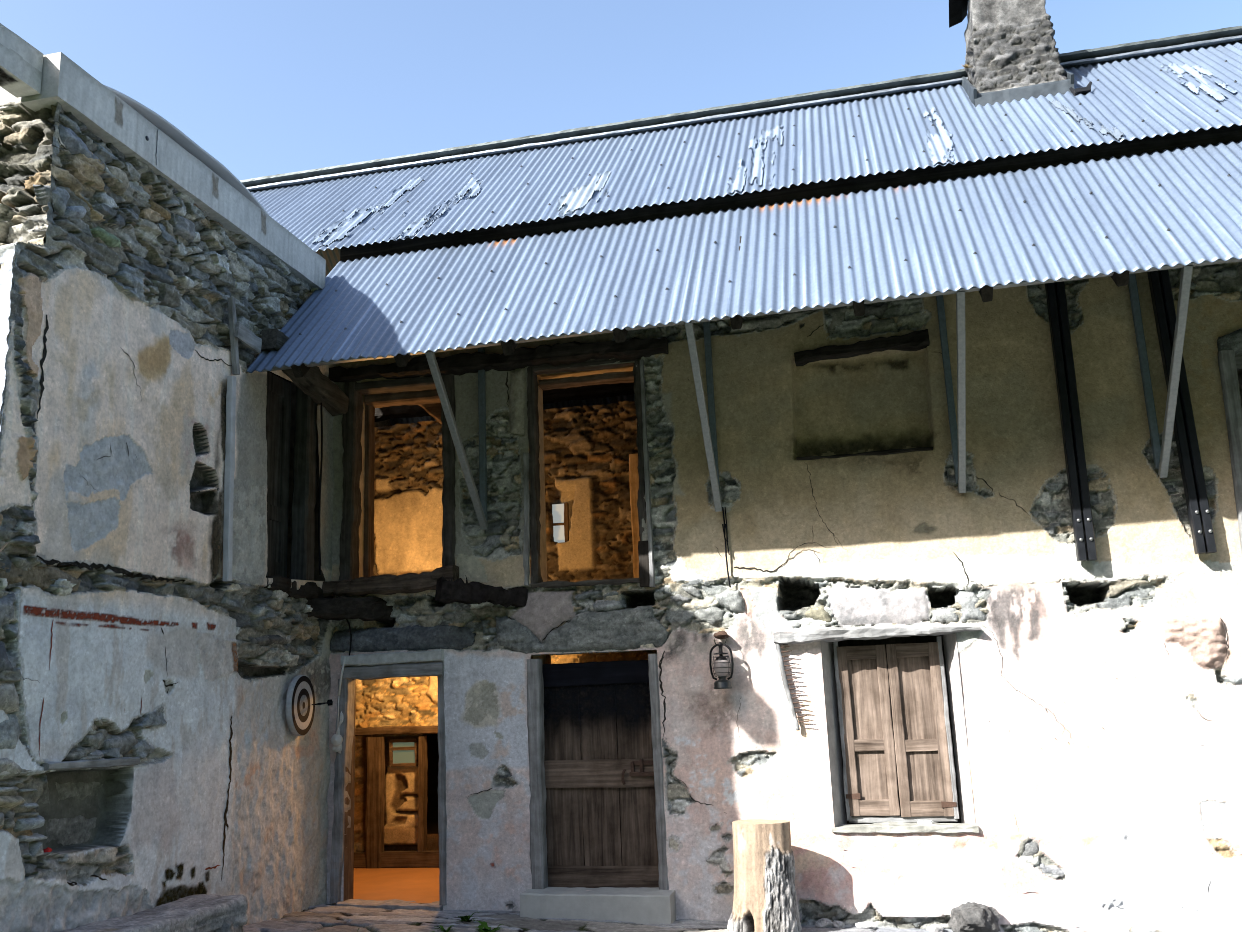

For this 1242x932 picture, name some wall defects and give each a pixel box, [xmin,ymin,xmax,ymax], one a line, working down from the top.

flaking render [0,258,46,411]
crack [37,315,49,419]
flaking render [62,431,156,555]
flaking render [456,552,578,641]
crack [716,465,844,572]
flaking render [667,463,1242,654]
crack [953,552,984,590]
leakage [991,601,1038,657]
crack [982,624,1070,733]
flaking render [1142,431,1193,541]
crack [221,716,233,880]
flaking render [662,736,696,817]